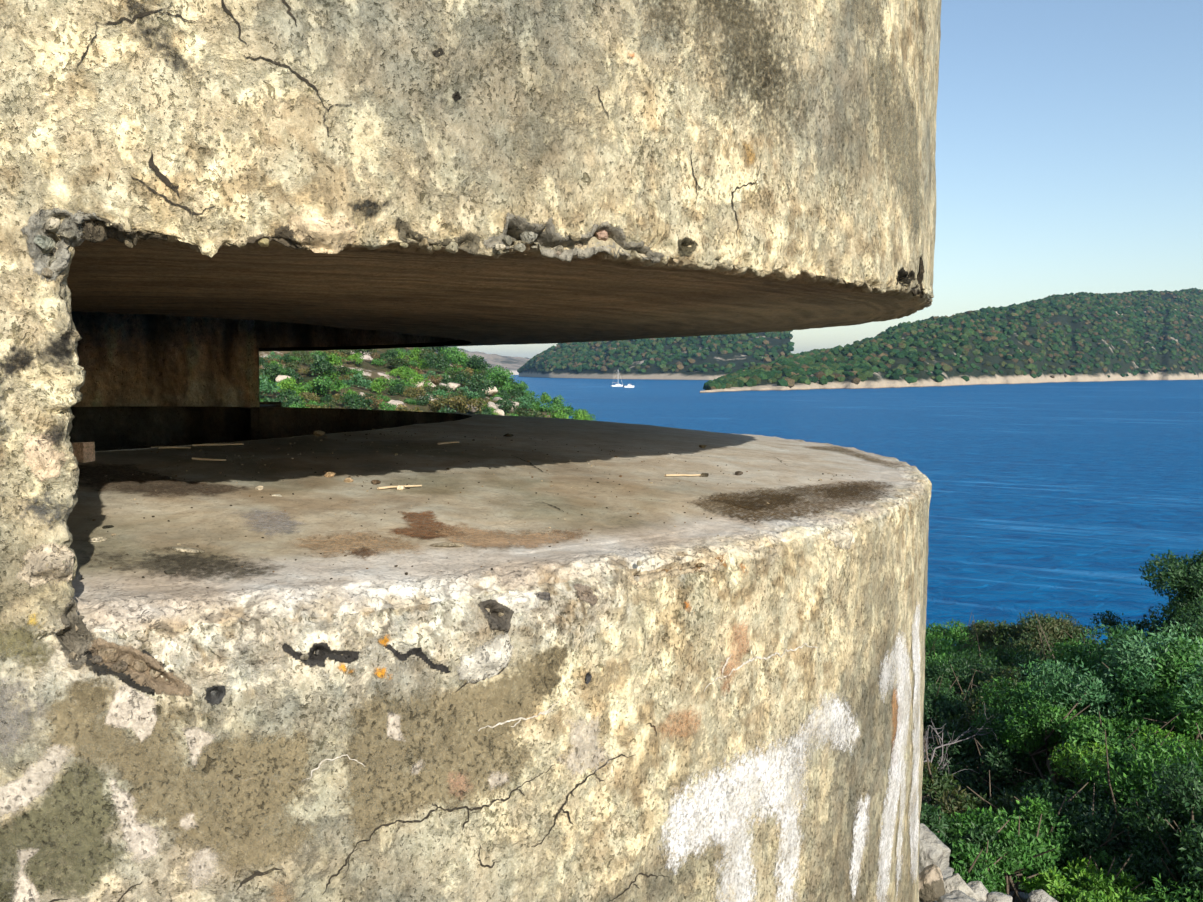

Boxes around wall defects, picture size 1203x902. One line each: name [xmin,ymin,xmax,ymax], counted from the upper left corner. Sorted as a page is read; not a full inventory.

crack [221,0,352,136]
crack [131,150,214,215]
spalling [21,208,170,282]
spalling [396,213,698,263]
water stain [715,493,799,510]
water stain [818,484,870,497]
spalling [478,599,514,634]
spalling [55,597,226,741]
spalling [282,642,359,667]
water stain [0,680,310,902]
crack [322,765,553,895]
crack [532,754,634,847]